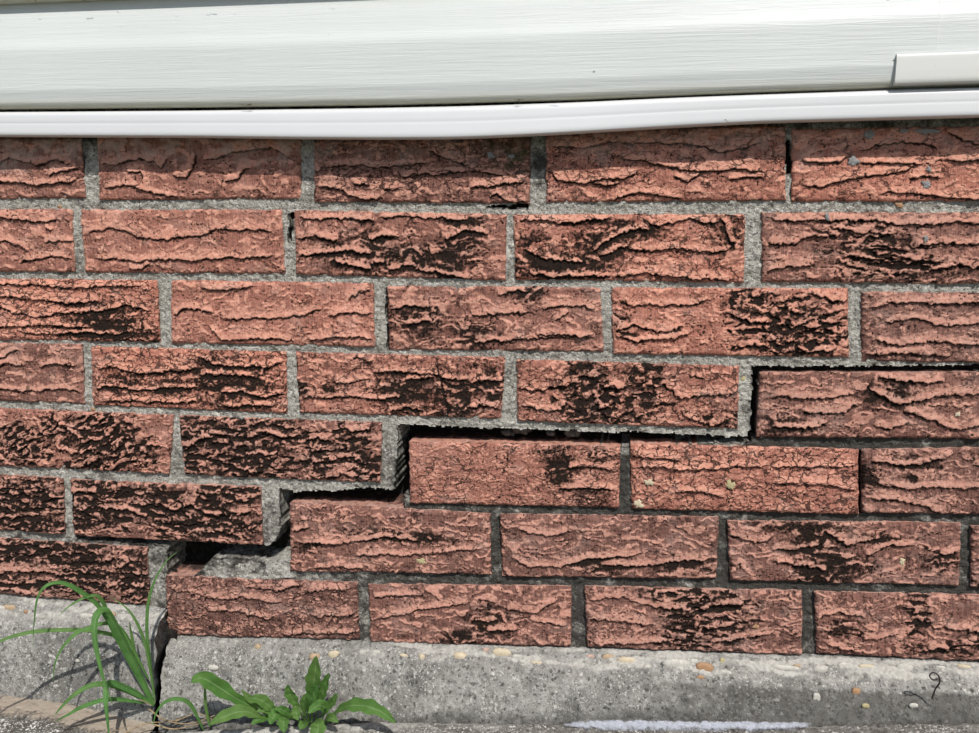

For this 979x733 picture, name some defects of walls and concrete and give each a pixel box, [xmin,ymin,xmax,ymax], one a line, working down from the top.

crack [288,212,296,241]
crack [488,202,529,210]
crack [344,354,642,494]
crack [744,364,979,437]
crack [855,449,863,511]
crack [172,525,291,573]
crack [164,615,177,659]